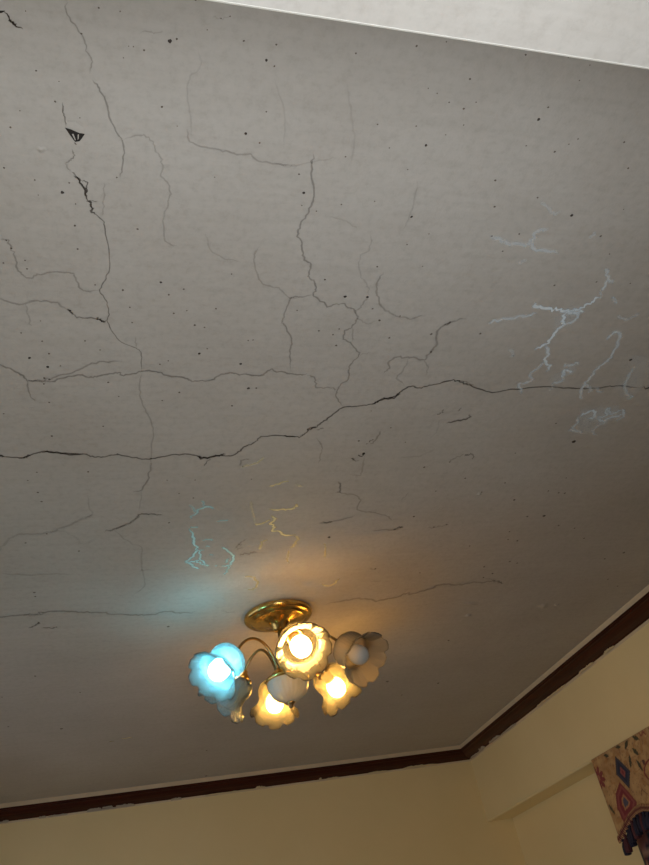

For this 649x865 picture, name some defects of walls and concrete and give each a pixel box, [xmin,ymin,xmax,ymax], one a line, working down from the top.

peeling [62,106,85,145]
crack [75,177,95,213]
damp [532,281,608,370]
crack [0,379,649,463]